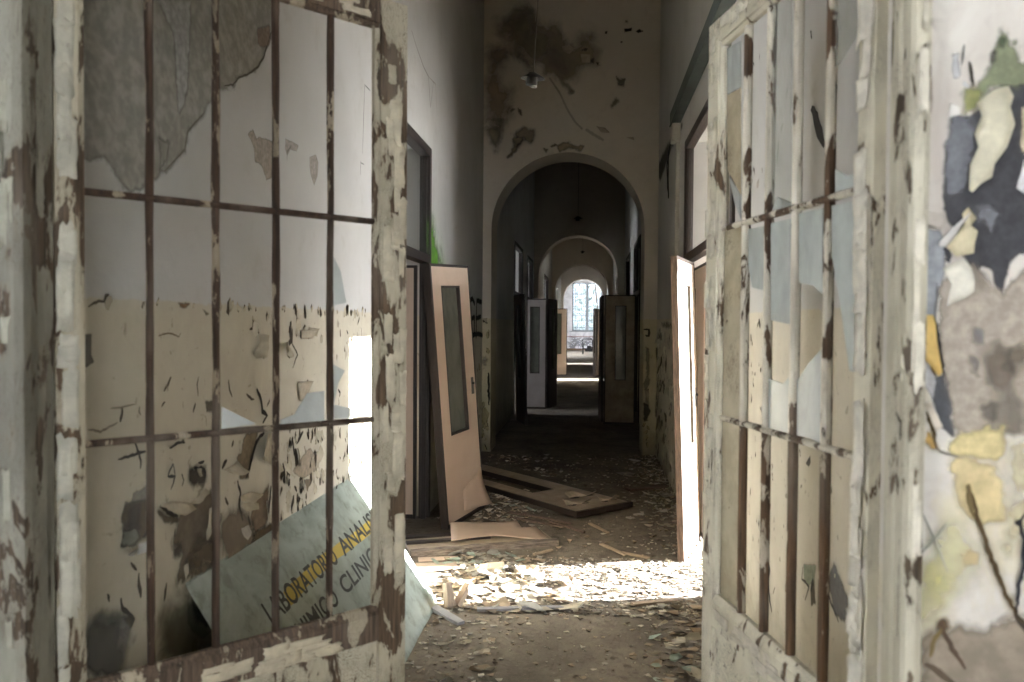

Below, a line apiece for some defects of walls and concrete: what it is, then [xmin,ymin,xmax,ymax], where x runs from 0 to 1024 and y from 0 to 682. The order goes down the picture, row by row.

peeling [53,0,272,191]
peeling [381,99,407,284]
water stain [508,128,534,157]
water stain [487,7,607,147]
peeling [811,105,825,148]
peeling [852,147,872,376]
peeling [855,0,874,113]
flaking render [900,84,1024,533]
flaking render [121,389,367,583]
peeling [829,399,866,682]
peeling [201,634,344,682]
flaking render [920,618,1024,682]